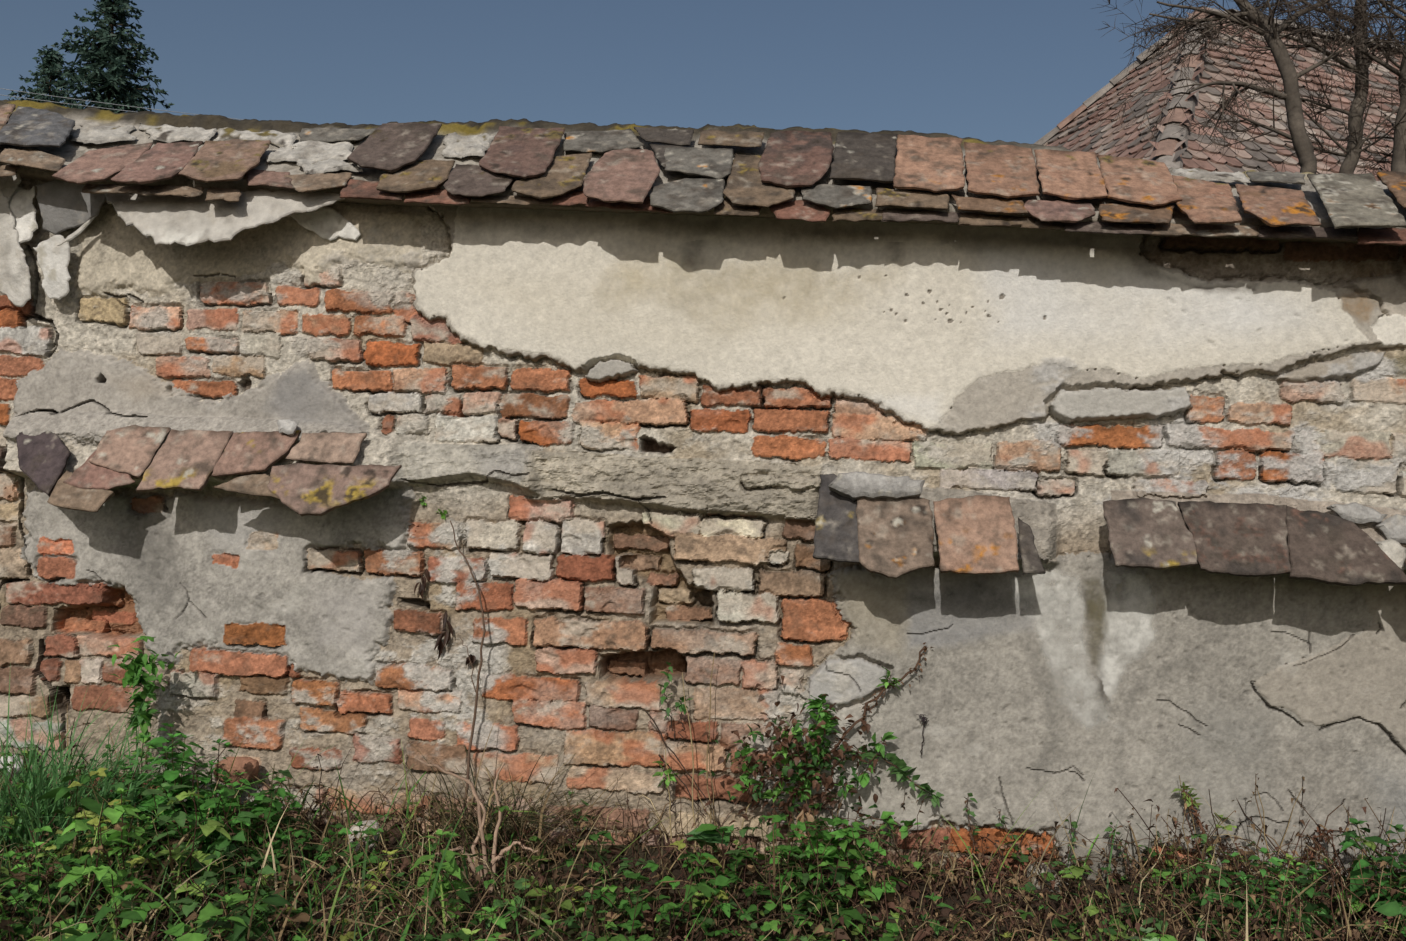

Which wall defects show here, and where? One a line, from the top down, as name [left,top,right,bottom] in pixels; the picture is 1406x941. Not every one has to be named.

spalling [0,172,1406,510]
crack [16,399,148,417]
spalling [0,471,887,832]
water stain [1012,571,1154,725]
crack [1271,622,1383,666]
crack [1250,680,1406,753]
spalling [936,821,1063,877]
spalling [1135,845,1218,879]